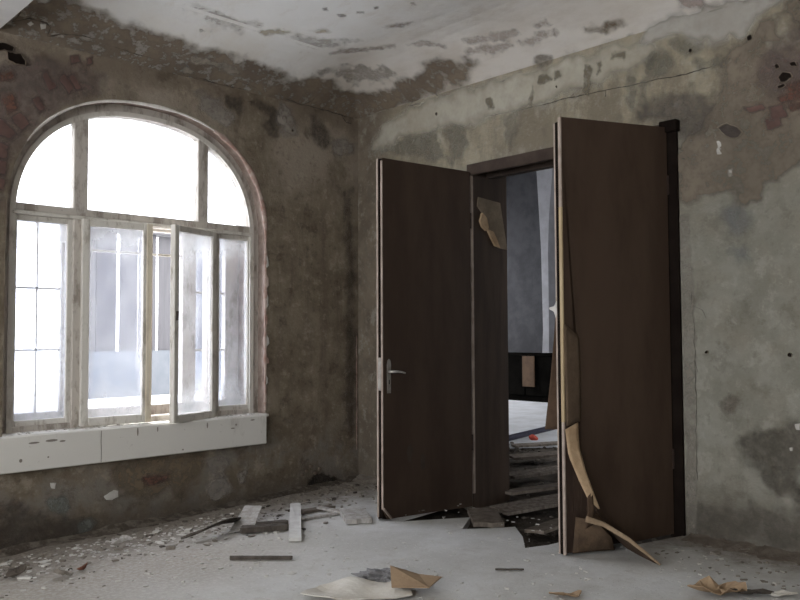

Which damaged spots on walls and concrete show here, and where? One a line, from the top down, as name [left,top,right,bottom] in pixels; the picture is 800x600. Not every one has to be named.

spalling [0,42,27,66]
water stain [0,0,518,147]
water stain [529,55,561,106]
water stain [583,62,602,95]
crack [484,66,712,117]
peeling [678,0,800,205]
water stain [384,124,468,165]
water stain [741,423,800,496]